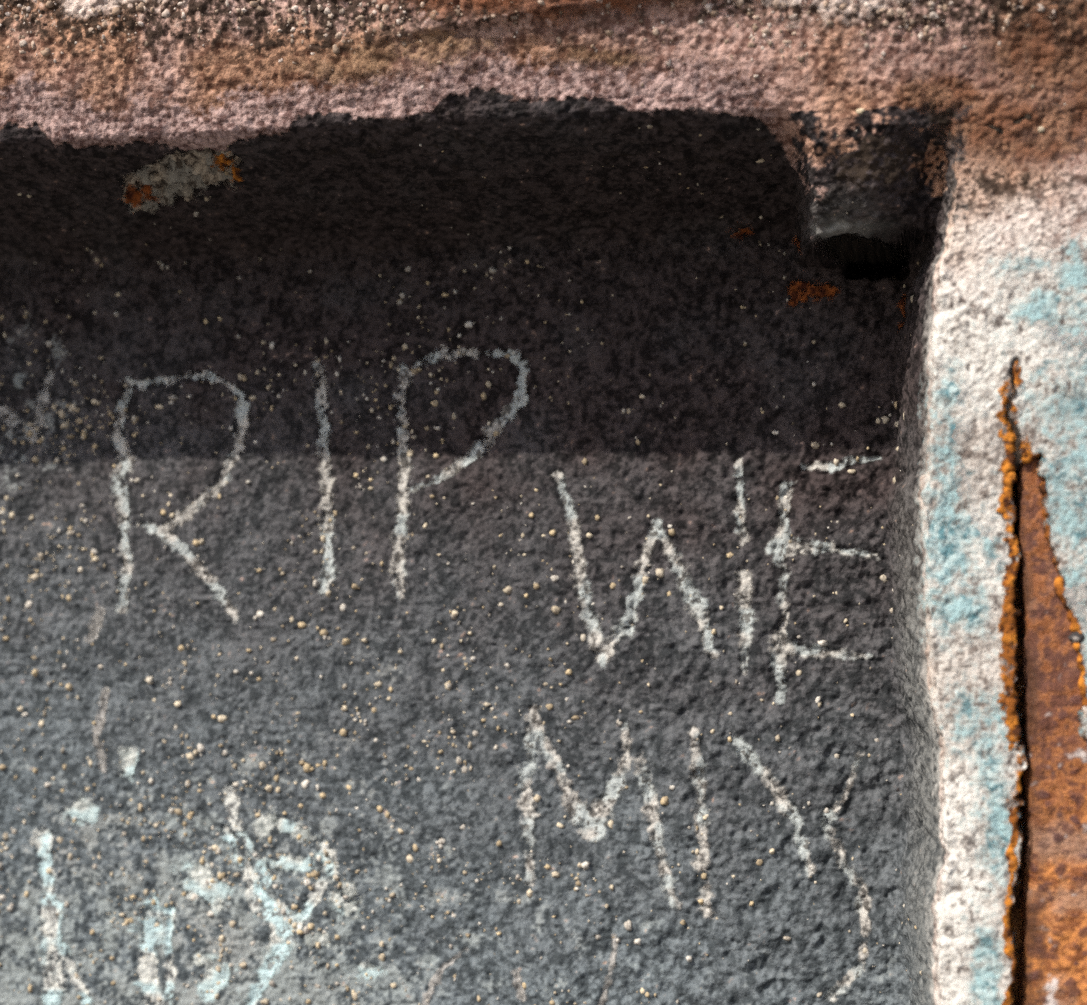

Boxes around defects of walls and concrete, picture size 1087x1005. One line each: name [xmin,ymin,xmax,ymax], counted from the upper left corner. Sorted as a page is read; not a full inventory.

rust [788,281,840,306]
peeling [1012,240,1087,609]
rust [996,360,1041,1005]
rust [1038,477,1087,712]
spalling [1068,632,1087,740]